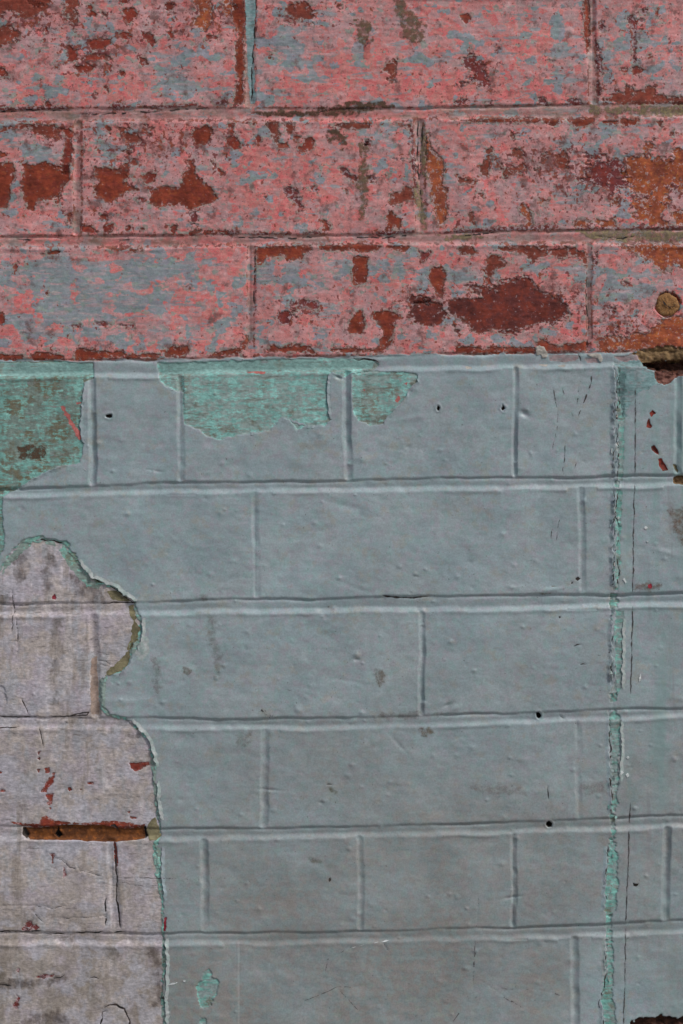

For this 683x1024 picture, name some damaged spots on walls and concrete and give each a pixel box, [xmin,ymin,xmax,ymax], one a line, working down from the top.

peeling [0,0,50,48]
peeling [64,0,156,76]
peeling [193,0,246,105]
peeling [446,50,492,106]
peeling [583,0,683,105]
peeling [0,101,85,211]
peeling [456,117,640,199]
peeling [574,152,683,230]
peeling [0,121,599,1024]
crack [609,378,636,691]
rust [23,824,145,842]
crack [598,711,631,1024]